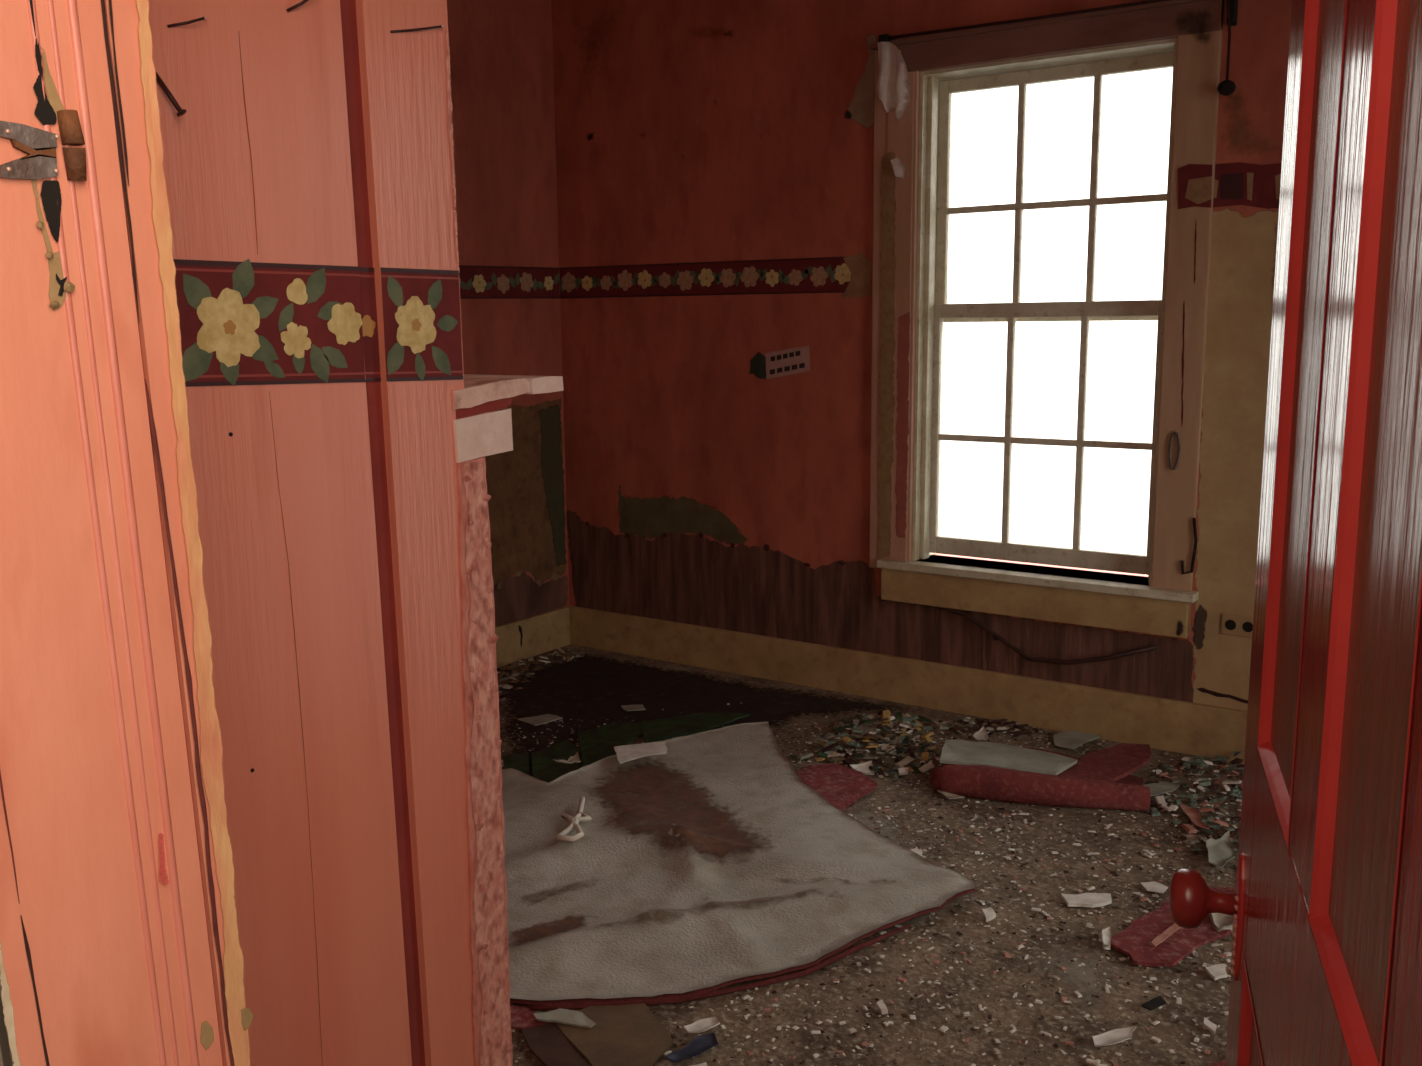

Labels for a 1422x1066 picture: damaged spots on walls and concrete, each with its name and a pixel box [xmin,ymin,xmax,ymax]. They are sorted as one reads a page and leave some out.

peeling [462,152,1279,1066]